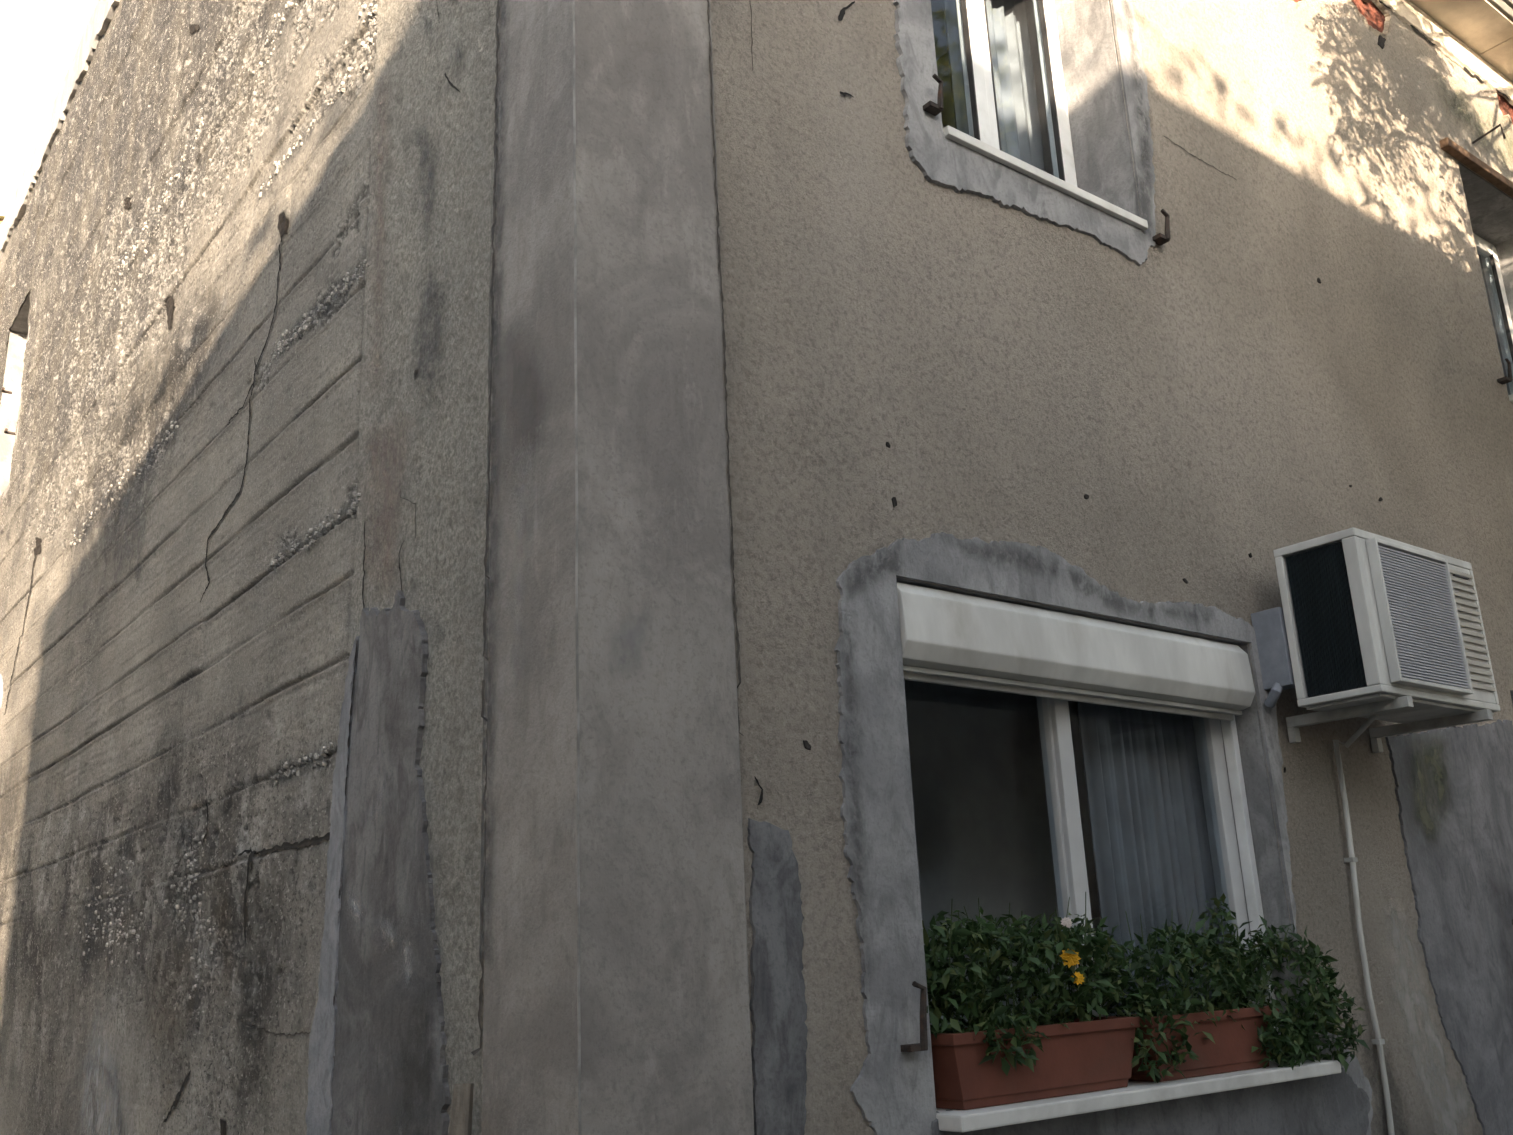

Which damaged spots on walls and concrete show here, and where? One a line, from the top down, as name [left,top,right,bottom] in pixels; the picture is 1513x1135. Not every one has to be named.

flaking render [1348,0,1391,49]
flaking render [1493,89,1513,130]
crack [200,211,289,602]
crack [444,0,500,1056]
crack [4,537,42,715]
crack [238,832,330,943]